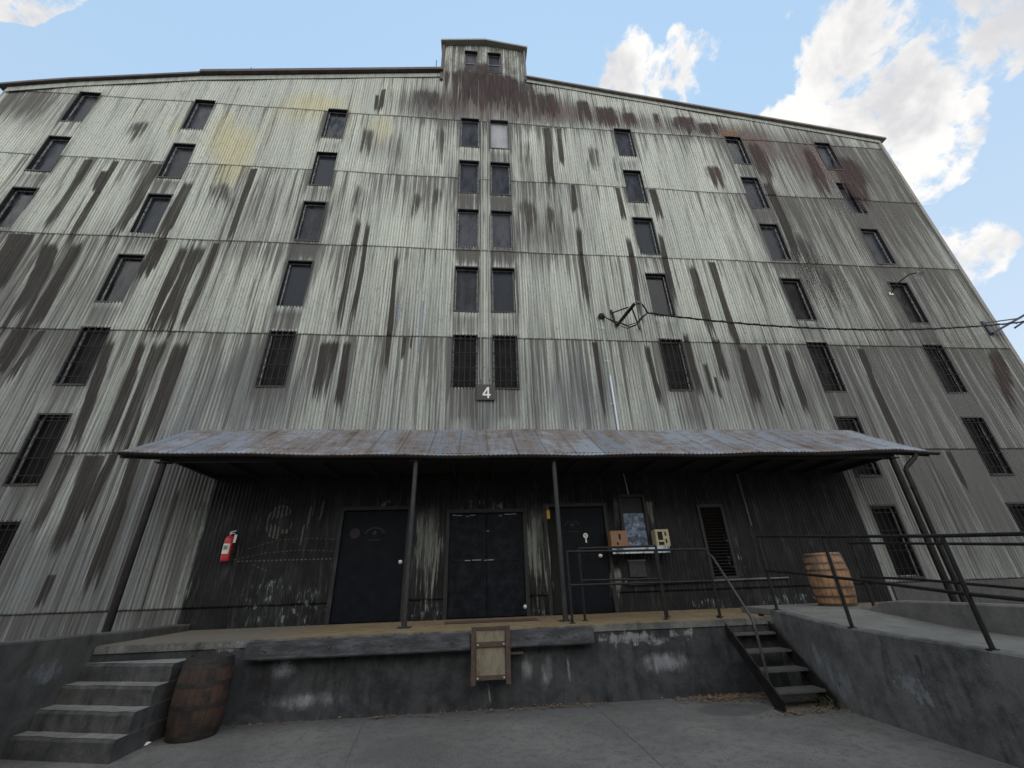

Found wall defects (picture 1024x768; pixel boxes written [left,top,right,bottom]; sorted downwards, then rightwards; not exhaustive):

corrosion [431,64,560,119]
corrosion [575,101,638,129]
corrosion [653,114,739,135]
corrosion [705,166,725,191]
corrosion [805,150,876,213]
water stain [0,159,119,382]
water stain [31,163,257,596]
water stain [312,187,370,411]
water stain [383,258,413,380]
water stain [626,239,665,408]
water stain [683,261,763,407]
peeling [599,628,692,646]